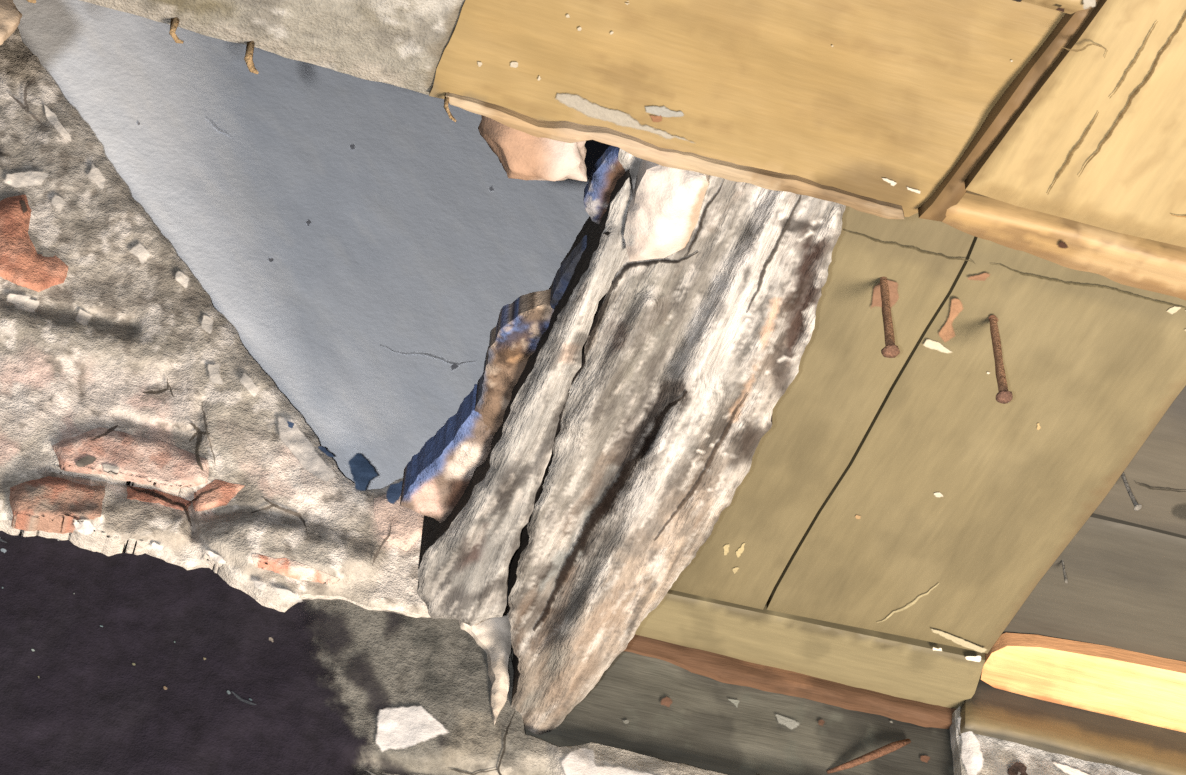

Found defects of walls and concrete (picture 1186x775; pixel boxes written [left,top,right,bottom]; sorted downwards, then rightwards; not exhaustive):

spalling [44,105,71,141]
crack [1047,13,1186,195]
spalling [0,171,68,312]
spalling [130,243,151,264]
rust [871,280,899,308]
rust [939,299,963,342]
crack [143,379,174,397]
crack [91,425,118,441]
spalling [0,427,245,535]
crack [127,402,220,526]
spalling [278,417,336,482]
crack [251,497,307,531]